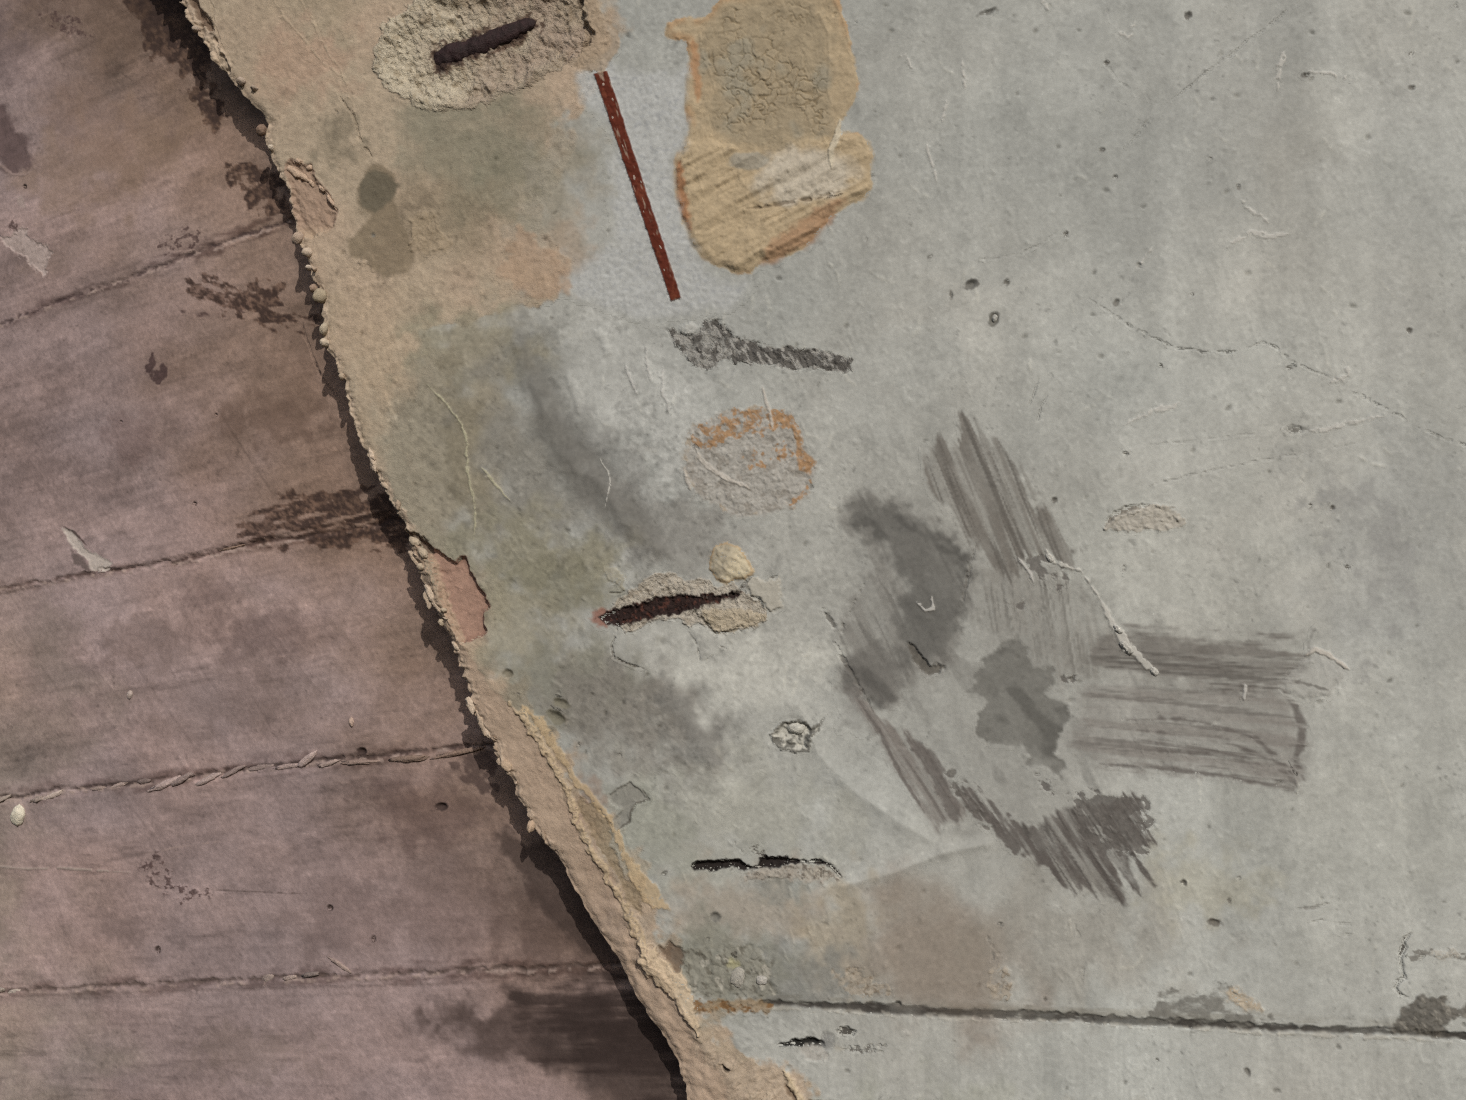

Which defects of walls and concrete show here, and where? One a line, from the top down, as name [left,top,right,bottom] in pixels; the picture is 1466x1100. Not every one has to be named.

spalling [370,0,684,304]
spalling [665,315,856,377]
corrosion [676,383,823,522]
peeling [255,116,828,1100]
damp [861,707,963,826]
damp [1095,689,1312,796]